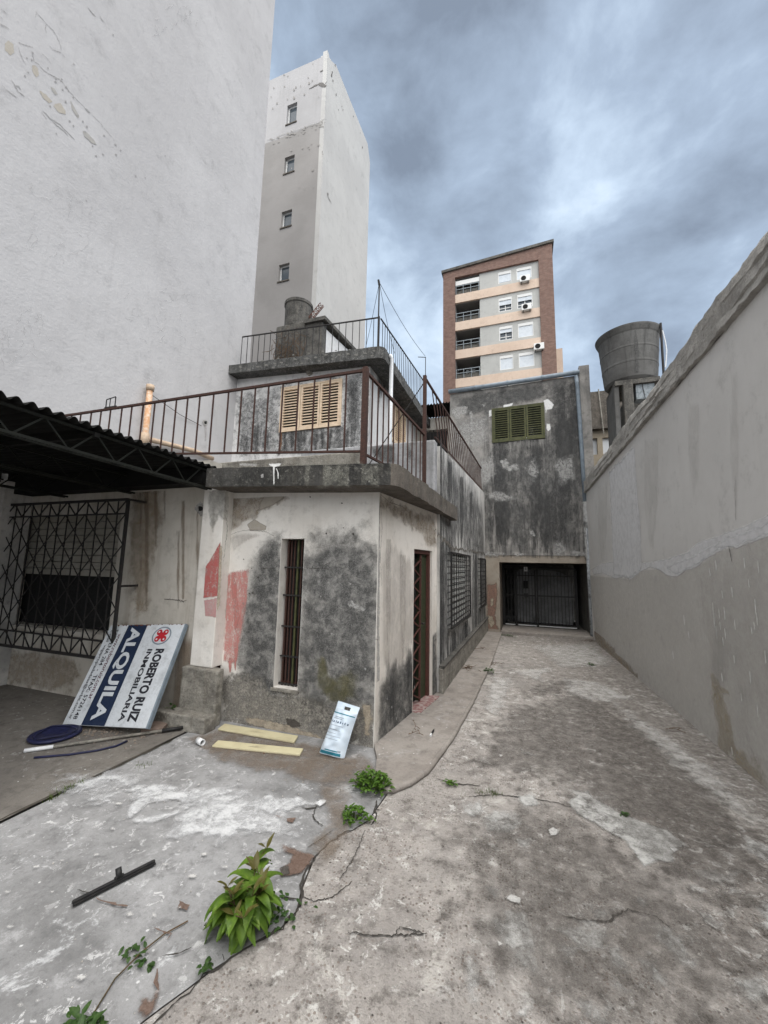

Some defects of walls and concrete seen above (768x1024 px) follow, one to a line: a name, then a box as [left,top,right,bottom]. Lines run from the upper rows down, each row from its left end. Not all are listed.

flaking render [24,52,121,157]
water stain [229,536,282,697]
water stain [298,533,415,739]
water stain [381,383,584,695]